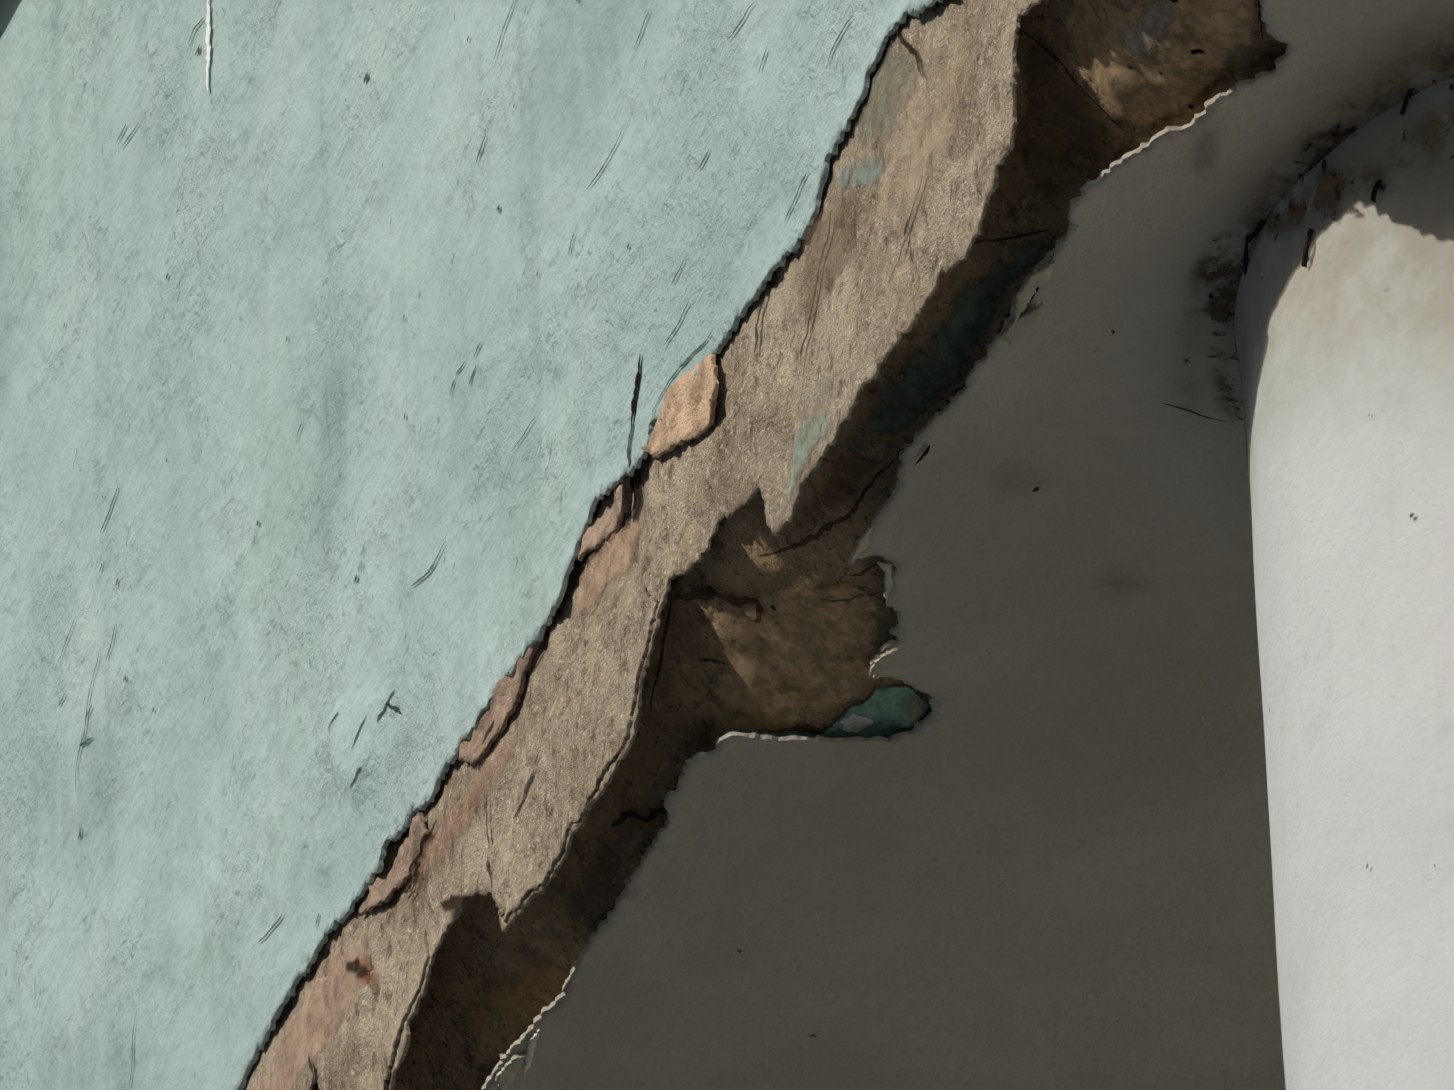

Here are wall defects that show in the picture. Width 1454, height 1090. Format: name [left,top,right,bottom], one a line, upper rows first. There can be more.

damp [1265,124,1386,241]
peeling [1001,260,1057,345]
mould [1197,240,1242,360]
spalling [243,0,1047,1090]